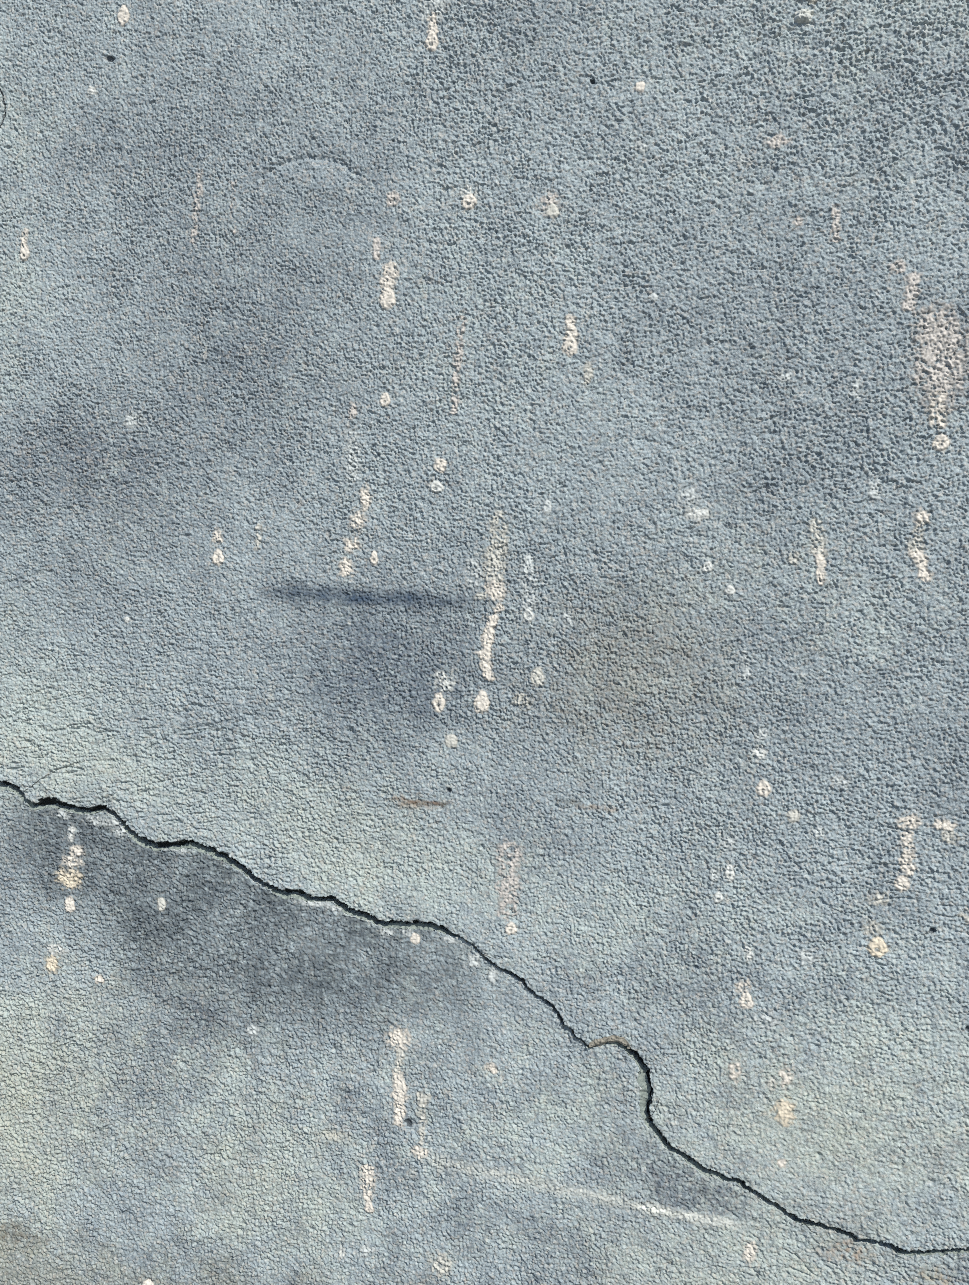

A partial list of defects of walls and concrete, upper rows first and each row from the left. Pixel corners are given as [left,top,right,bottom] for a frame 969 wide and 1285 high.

crack [0,761,969,1257]